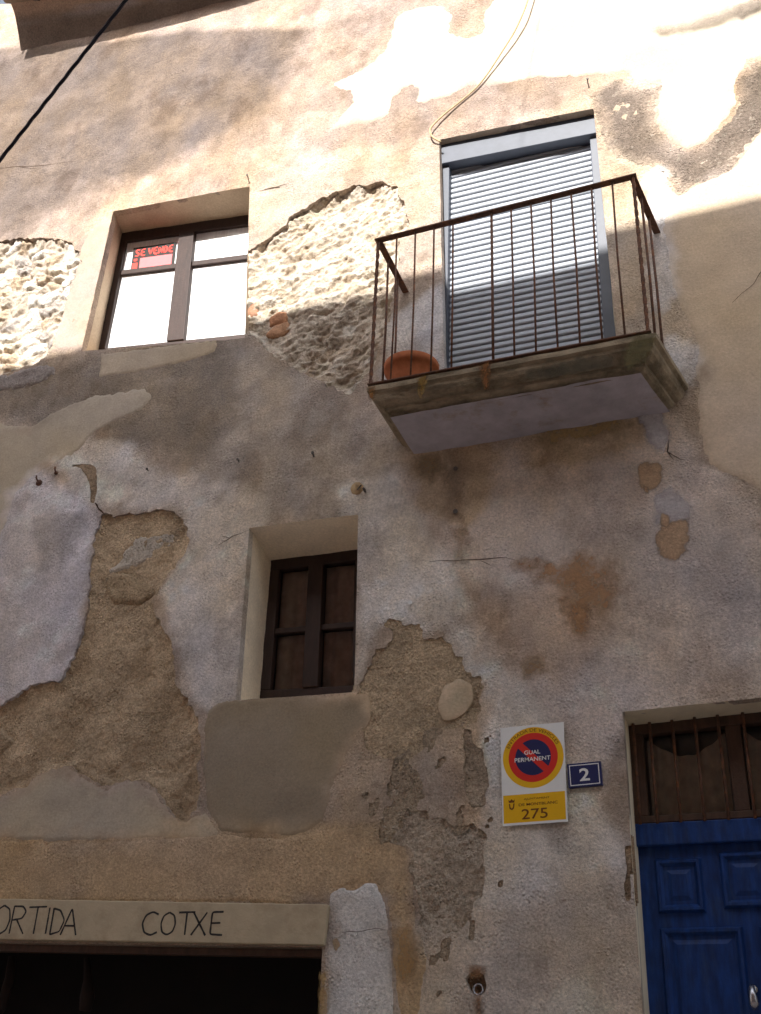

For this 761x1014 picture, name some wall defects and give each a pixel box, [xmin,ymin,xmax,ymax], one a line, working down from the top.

spalling [588,61,761,192]
spalling [638,462,662,493]
spalling [655,514,689,560]
spalling [0,510,201,821]
spalling [352,619,493,965]